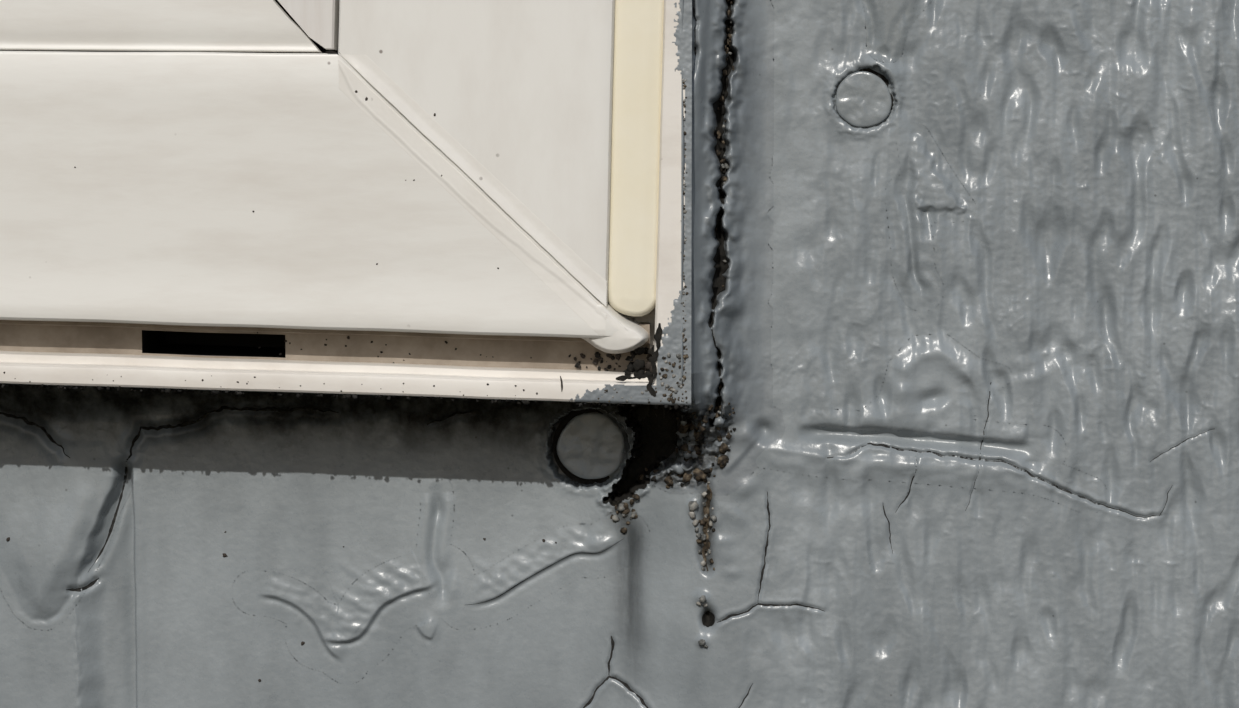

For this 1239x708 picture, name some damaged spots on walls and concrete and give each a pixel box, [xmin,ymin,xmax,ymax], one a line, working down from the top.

crack [692,0,734,414]
crack [0,412,70,458]
crack [688,479,717,571]
crack [714,492,823,623]
crack [827,383,1172,553]